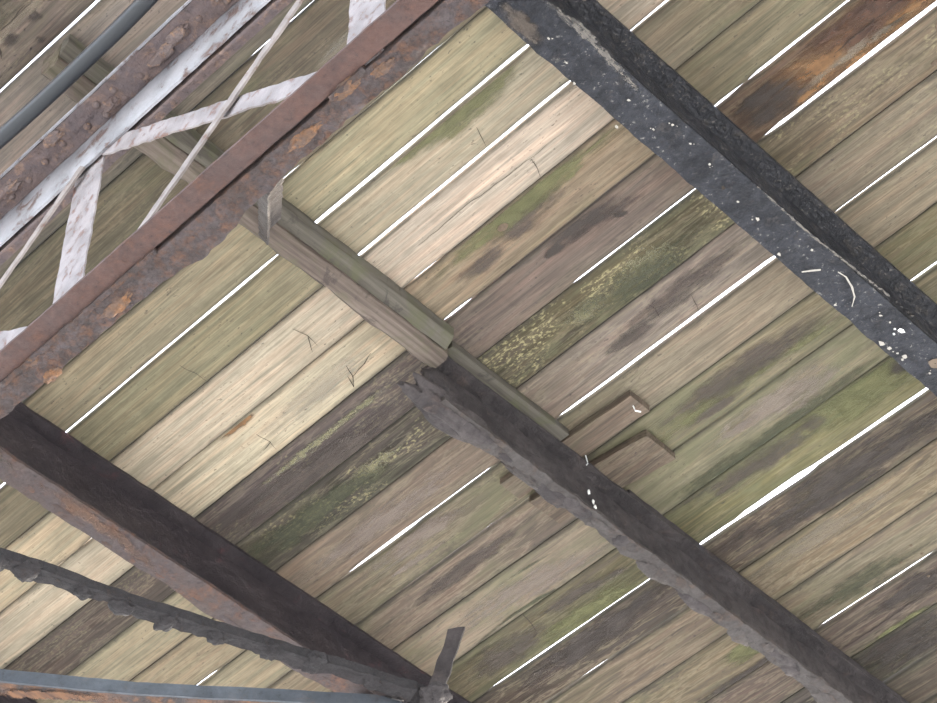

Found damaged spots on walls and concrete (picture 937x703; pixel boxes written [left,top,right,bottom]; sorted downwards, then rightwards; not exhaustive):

rust [502,4,540,44]
rust [789,0,929,106]
damp [467,240,500,276]
damp [504,194,551,238]
damp [546,198,633,258]
damp [679,330,807,422]
rust [222,415,253,438]
damp [246,414,388,523]
damp [711,416,823,496]
damp [734,411,937,541]
rust [1,690,102,701]